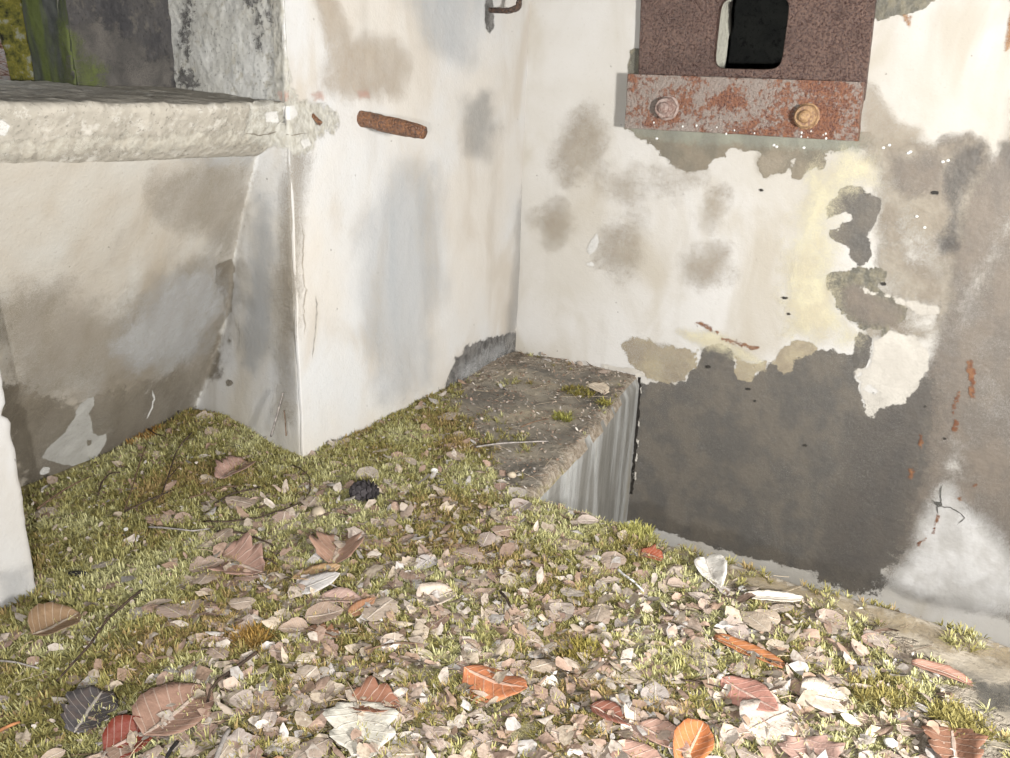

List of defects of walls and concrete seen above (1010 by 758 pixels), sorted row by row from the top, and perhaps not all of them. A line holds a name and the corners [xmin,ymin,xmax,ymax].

spalling [245,0,340,156]
spalling [875,0,935,21]
water stain [445,80,1010,622]